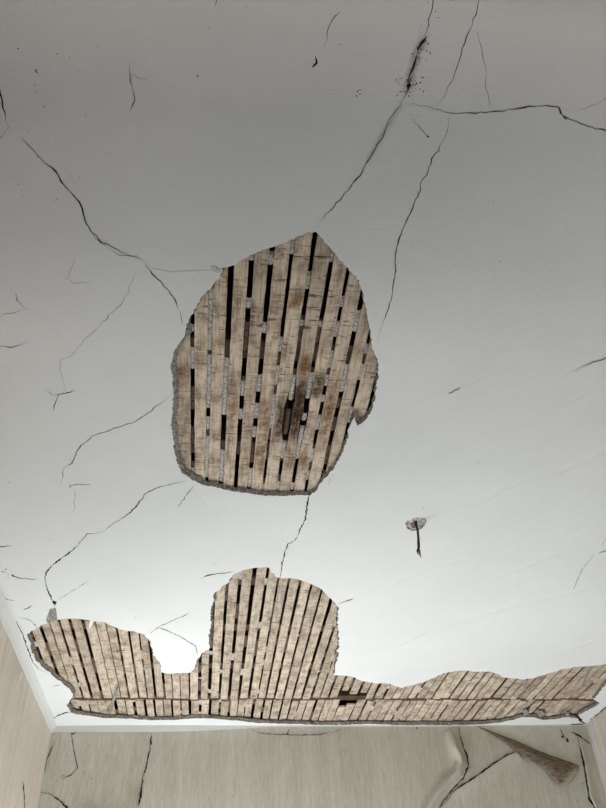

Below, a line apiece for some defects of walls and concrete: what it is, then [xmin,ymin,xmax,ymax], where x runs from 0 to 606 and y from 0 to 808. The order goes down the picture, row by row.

crack [0,91,182,410]
crack [322,0,606,341]
crack [5,598,57,686]
crack [11,482,192,607]
crack [61,395,172,508]
spalling [170,266,379,496]
crack [280,492,311,576]
spalling [27,570,606,768]